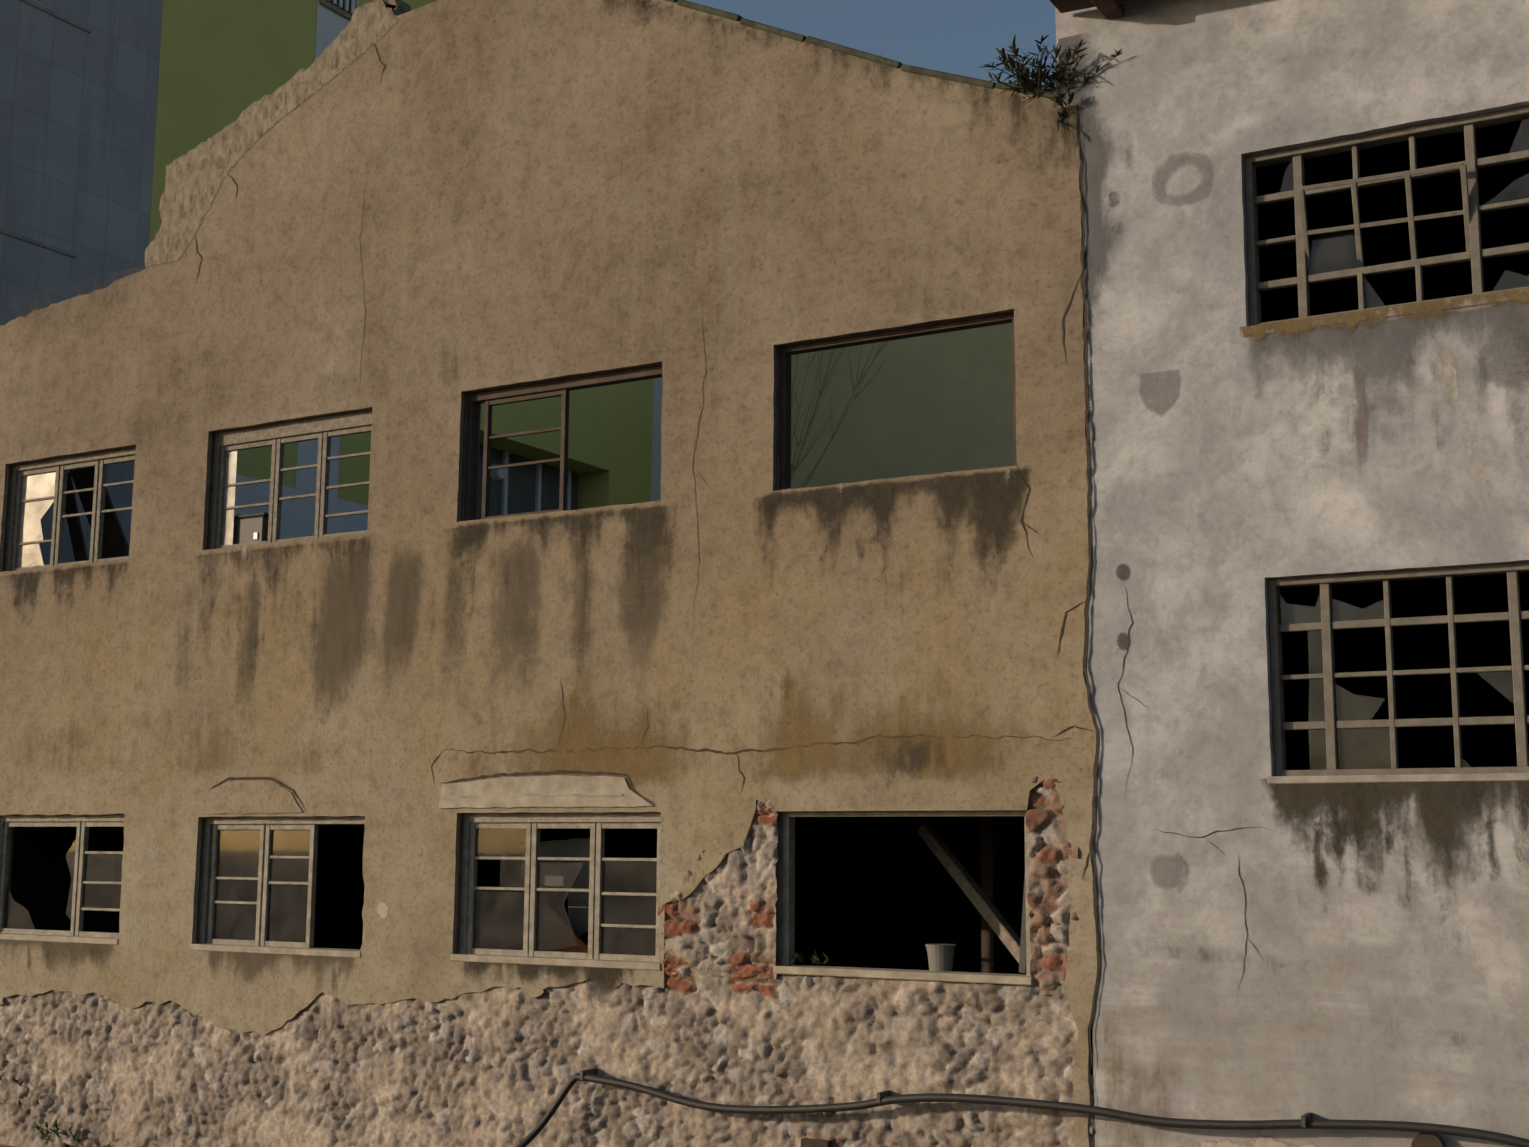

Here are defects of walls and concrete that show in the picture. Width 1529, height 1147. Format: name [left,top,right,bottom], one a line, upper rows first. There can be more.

leakage [10,563,126,607]
leakage [233,545,299,680]
leakage [314,538,370,698]
leakage [384,554,420,658]
leakage [446,506,671,656]
crack [627,104,1151,1147]
leakage [758,469,1027,561]
crack [431,682,591,783]
leakage [1265,778,1529,886]
flaking render [0,777,1095,1147]
crack [1154,827,1274,1004]